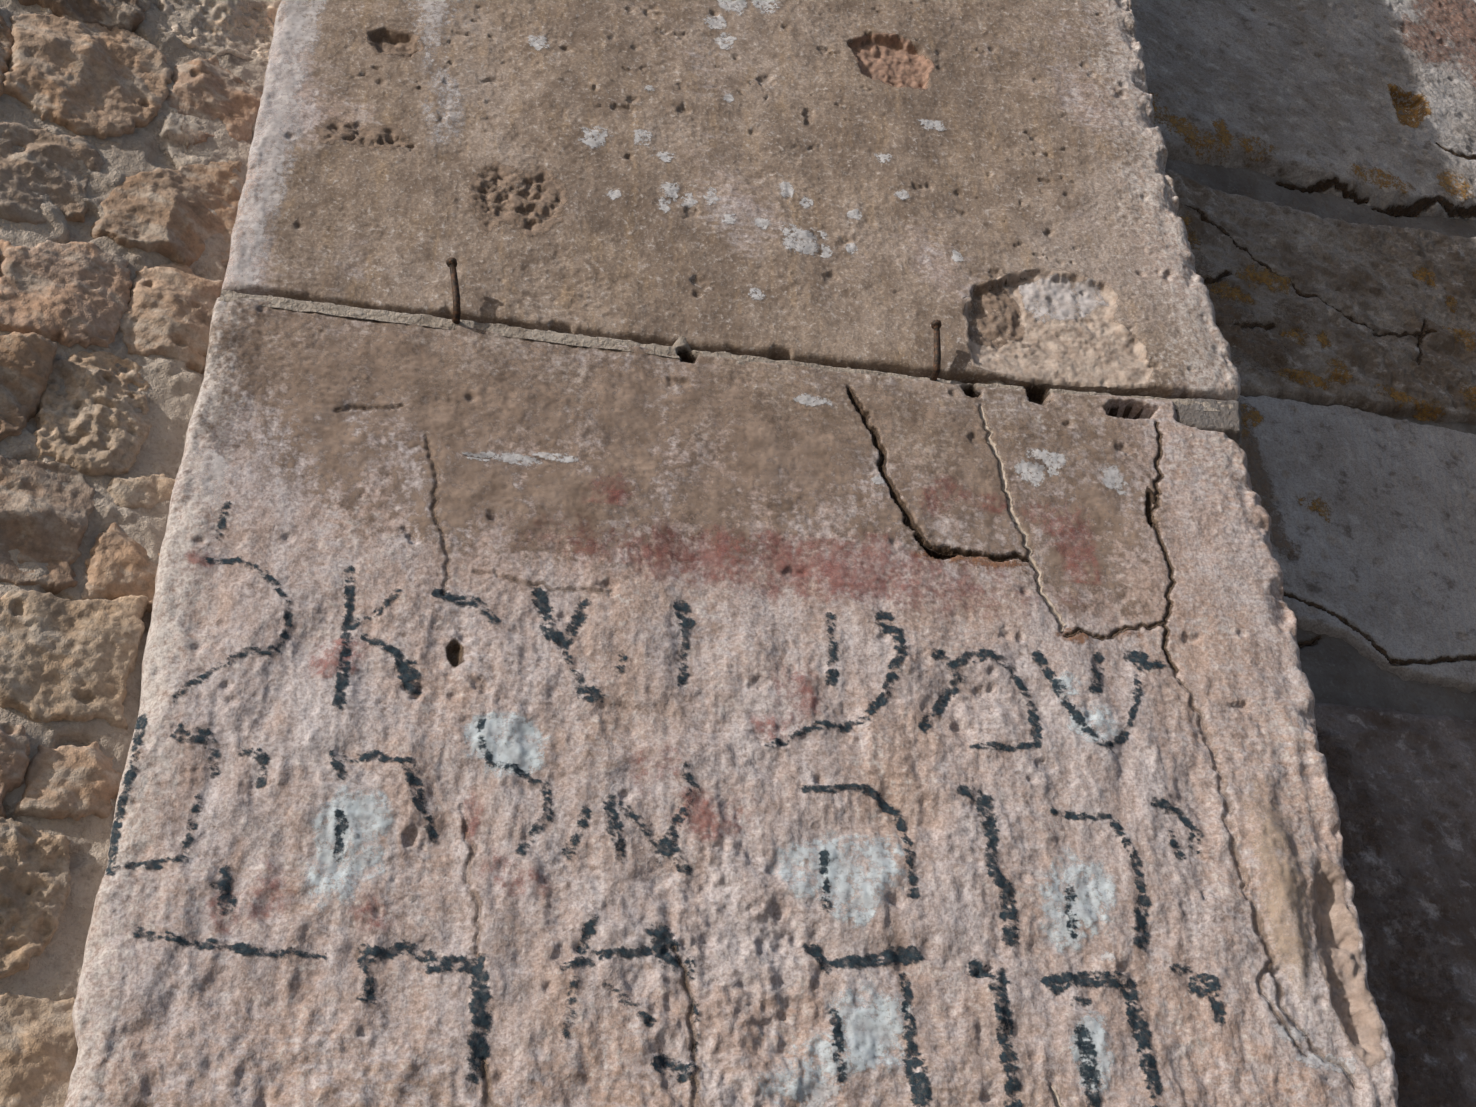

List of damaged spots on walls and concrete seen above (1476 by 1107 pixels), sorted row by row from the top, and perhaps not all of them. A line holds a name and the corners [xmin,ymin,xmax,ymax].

spalling [847,33,935,90]
crack [1276,177,1476,219]
spalling [964,267,1154,389]
crack [1186,205,1437,365]
crack [847,388,1178,673]
crack [1284,592,1476,665]